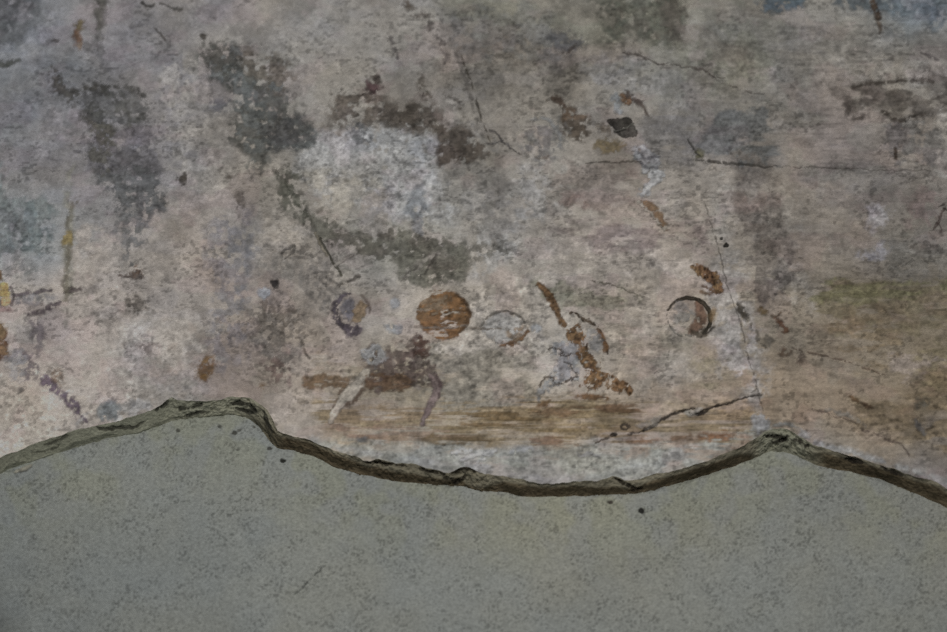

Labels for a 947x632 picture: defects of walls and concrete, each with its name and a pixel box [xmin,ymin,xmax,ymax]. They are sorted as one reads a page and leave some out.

spalling [0,396,947,508]
crack [628,395,761,435]